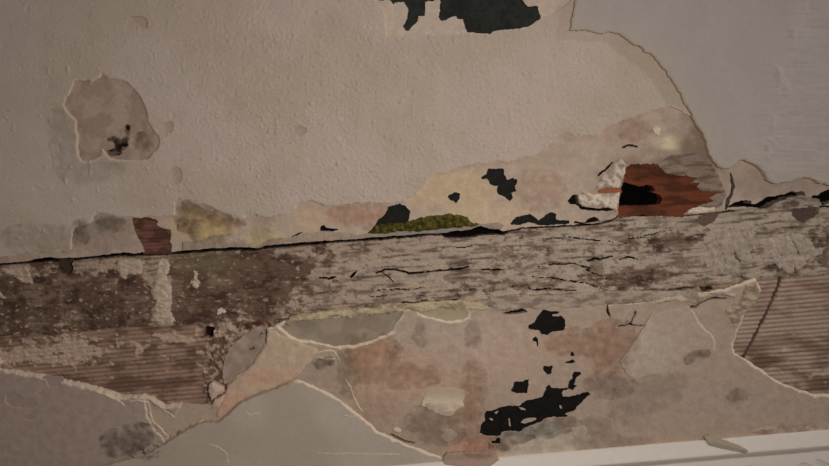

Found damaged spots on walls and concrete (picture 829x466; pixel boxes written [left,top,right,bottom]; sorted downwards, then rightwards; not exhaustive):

peeling [375,0,570,37]
flaking render [65,74,174,161]
peeling [481,168,517,201]
flaking render [575,159,626,212]
flaking render [182,204,570,251]
crack [0,252,143,264]
crack [175,215,660,303]
peeling [528,309,565,346]
peeling [619,306,714,386]
peeling [146,312,404,440]
peeling [422,387,469,416]
peeling [442,352,590,466]